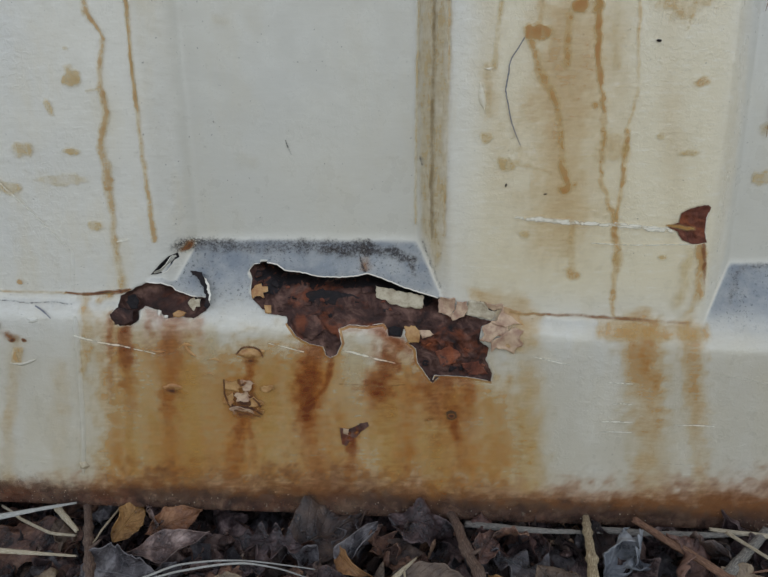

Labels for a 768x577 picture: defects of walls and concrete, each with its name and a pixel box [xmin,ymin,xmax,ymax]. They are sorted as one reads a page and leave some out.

corrosion [83,1,105,66]
corrosion [123,0,138,111]
corrosion [525,24,561,121]
corrosion [569,0,606,113]
corrosion [98,84,114,211]
corrosion [145,180,157,242]
peeling [110,252,211,326]
peeling [246,255,524,384]
peeling [666,205,713,244]
corrosion [696,244,707,297]
peeling [340,422,369,446]
corrosion [0,315,768,531]